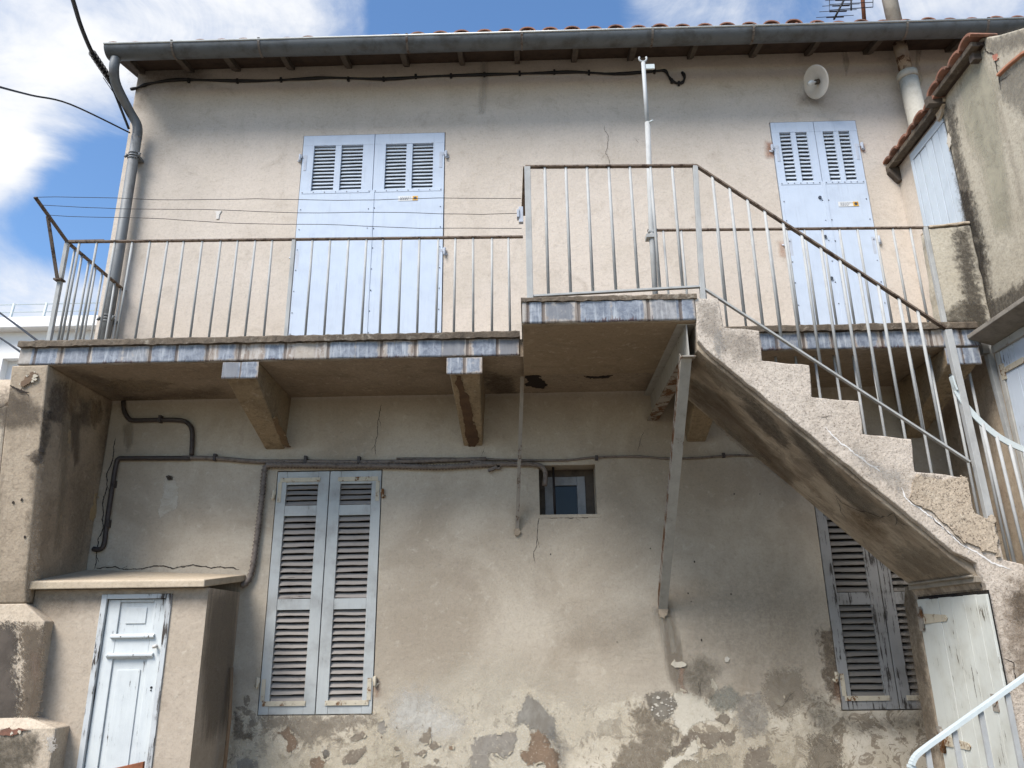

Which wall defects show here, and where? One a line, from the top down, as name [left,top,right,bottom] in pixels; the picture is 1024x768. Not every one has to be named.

water stain [944,60,1024,327]
flaking render [19,371,38,387]
water stain [0,385,67,483]
crack [819,415,879,471]
crack [95,438,239,570]
crack [836,487,1009,569]
flaking render [278,726,297,757]
flaking render [309,724,455,768]
flaking render [469,723,561,768]